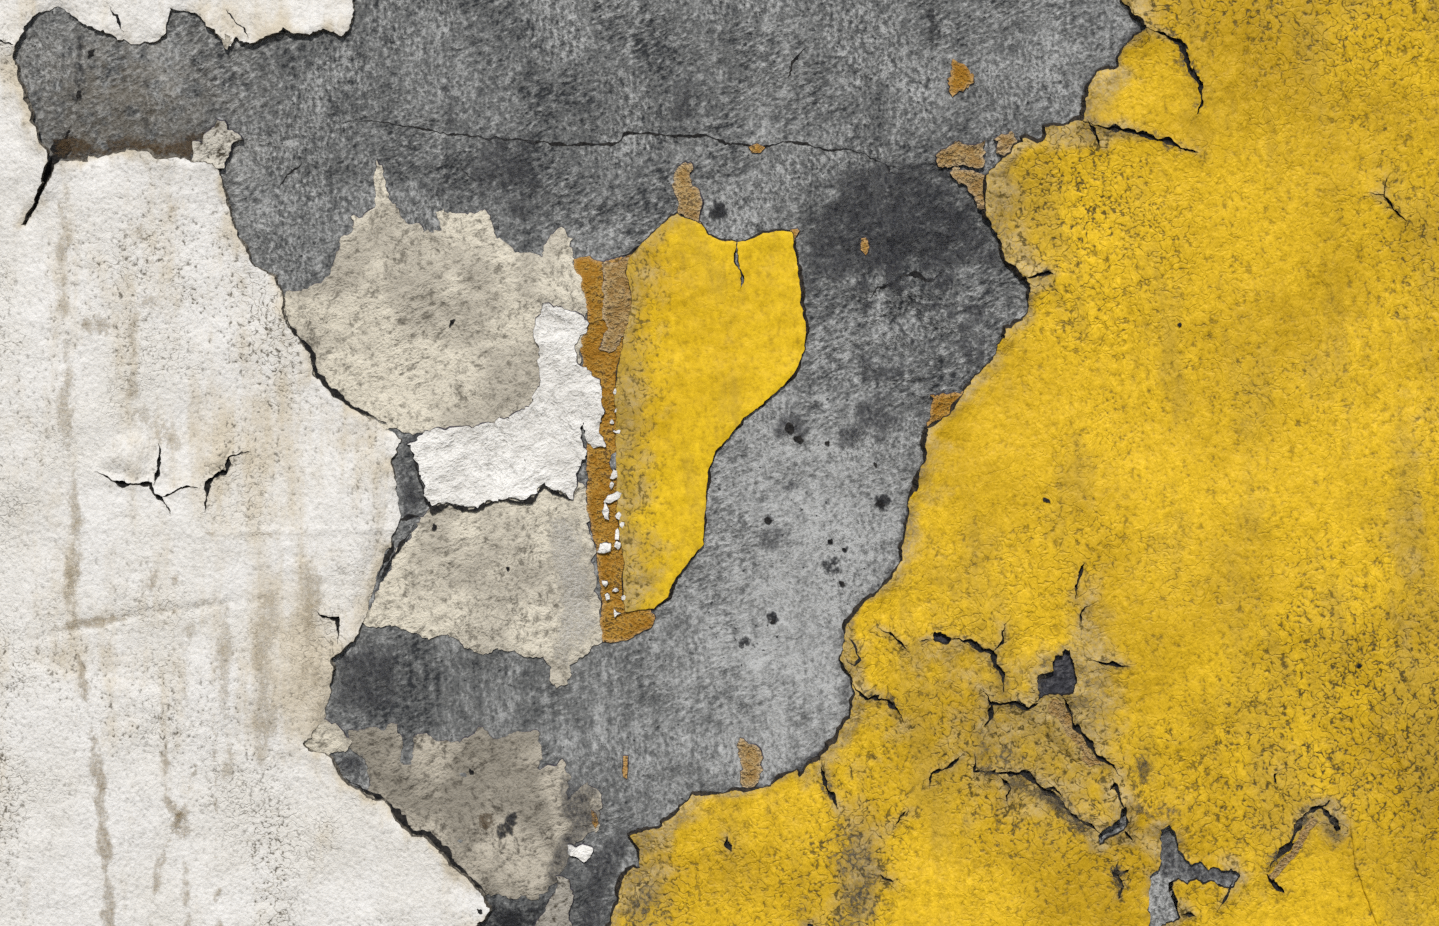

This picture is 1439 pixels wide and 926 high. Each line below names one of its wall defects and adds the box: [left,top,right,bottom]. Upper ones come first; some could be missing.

crack [1146,27,1203,113]
crack [26,130,72,221]
crack [340,120,936,181]
crack [1090,124,1197,152]
crack [106,448,248,512]
peeling [14,0,1145,926]
crack [846,630,905,716]
crack [929,627,1132,897]
peeling [1148,825,1240,926]